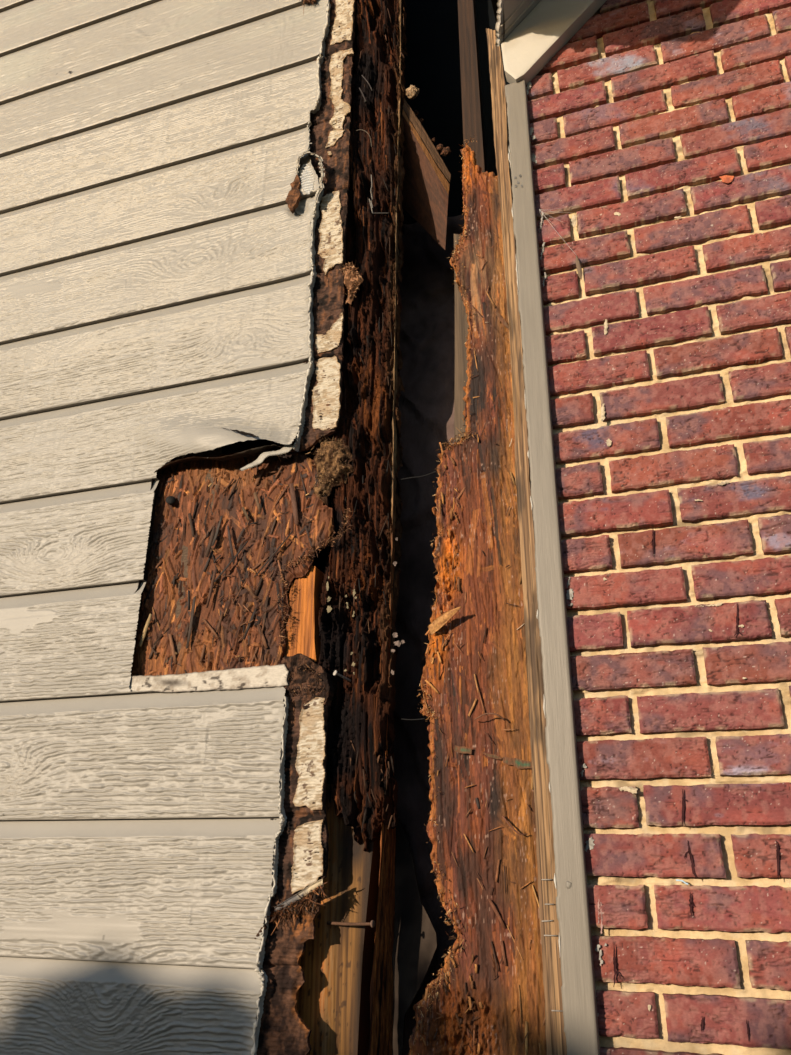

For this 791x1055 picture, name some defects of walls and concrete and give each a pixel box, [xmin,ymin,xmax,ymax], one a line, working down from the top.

peeling [286,0,355,452]
crack [220,427,258,437]
peeling [251,696,326,1055]
damp [454,745,532,769]